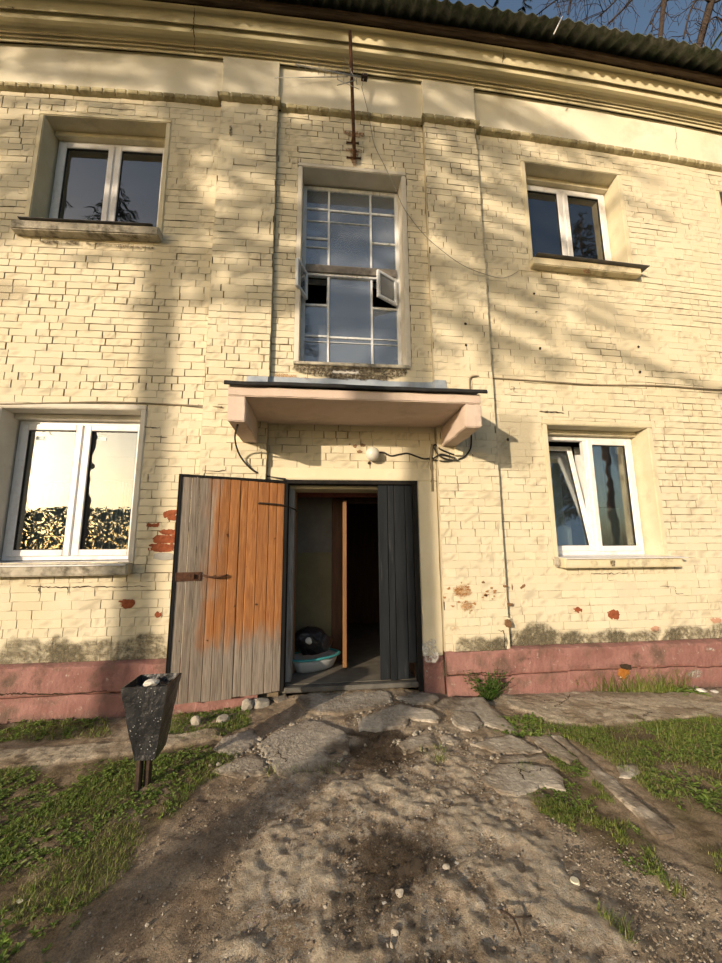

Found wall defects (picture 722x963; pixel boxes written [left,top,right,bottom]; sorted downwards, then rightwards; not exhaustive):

flaking render [146,510,177,552]
flaking render [118,599,135,609]
peeling [443,581,525,614]
water stain [0,634,167,665]
water stain [456,624,722,652]